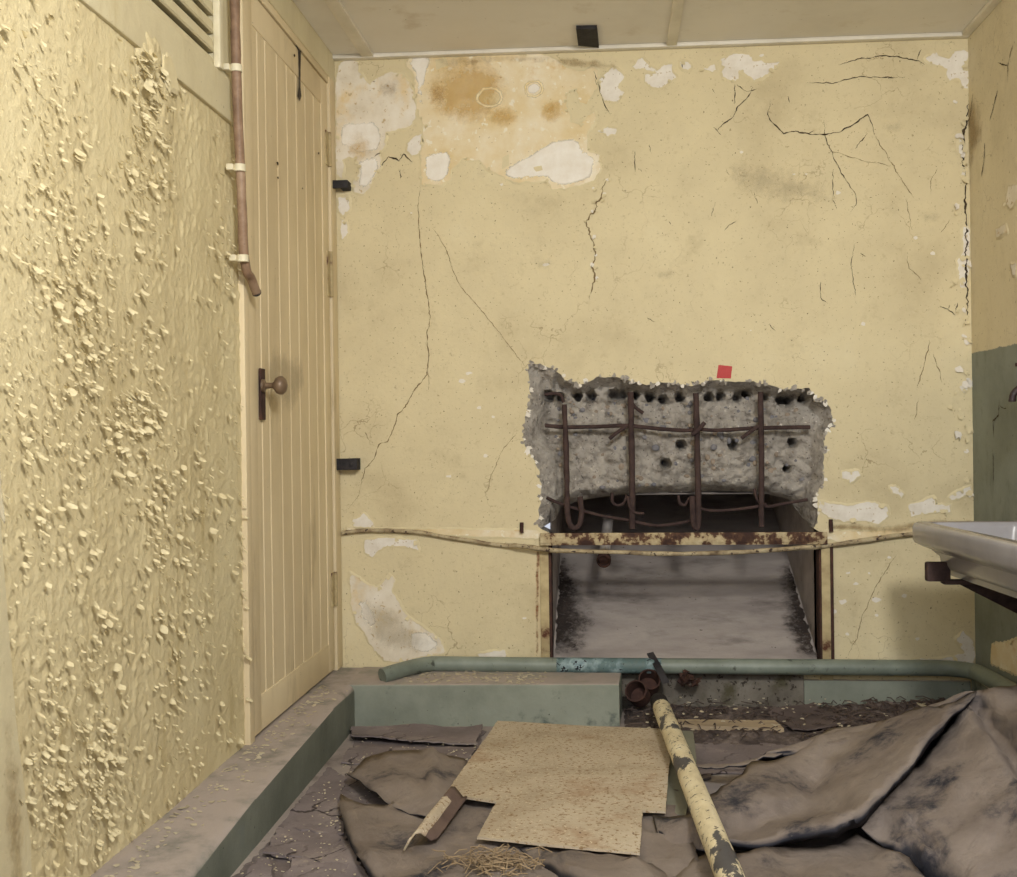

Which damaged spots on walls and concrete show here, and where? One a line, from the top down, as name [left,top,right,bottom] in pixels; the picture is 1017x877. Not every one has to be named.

peeling [335,52,781,241]
crack [712,85,937,229]
crack [815,50,922,93]
crack [348,153,521,509]
spalling [345,360,974,558]
peeling [347,570,446,663]